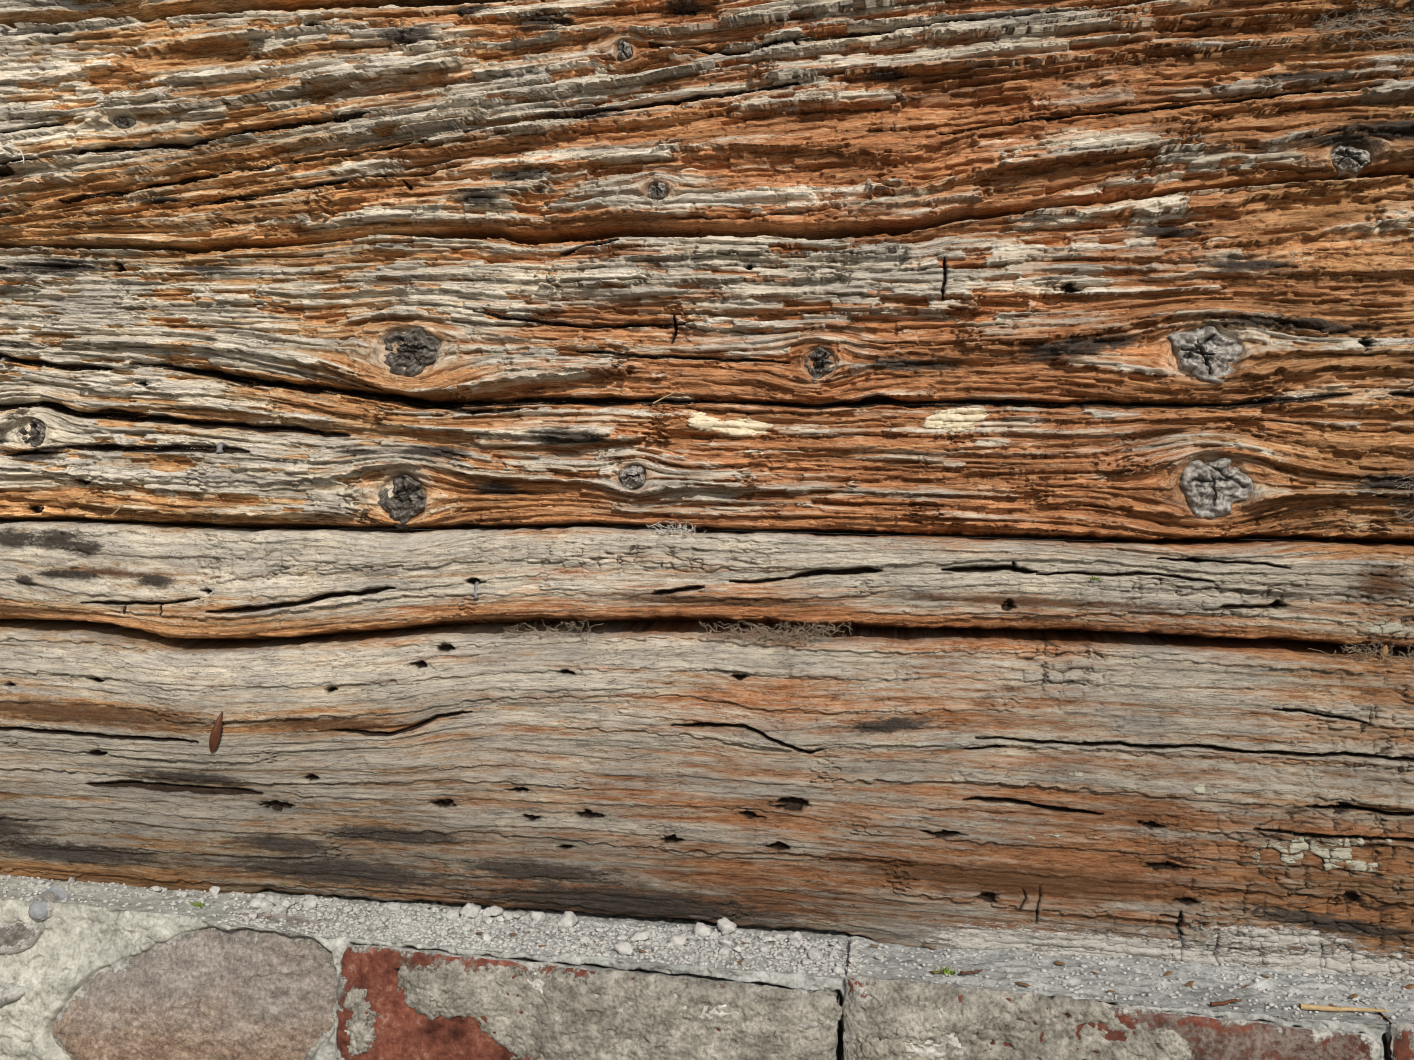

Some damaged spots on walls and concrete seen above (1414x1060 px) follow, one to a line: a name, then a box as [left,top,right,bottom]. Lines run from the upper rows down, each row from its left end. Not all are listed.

crack [80,557,396,616]
crack [964,594,1414,774]
crack [337,711,473,736]
crack [671,723,823,753]
crack [963,797,1104,815]
crack [1019,887,1041,924]
crack [1141,800,1414,974]
flaking render [341,987,385,1059]
flaking render [397,959,1193,1060]